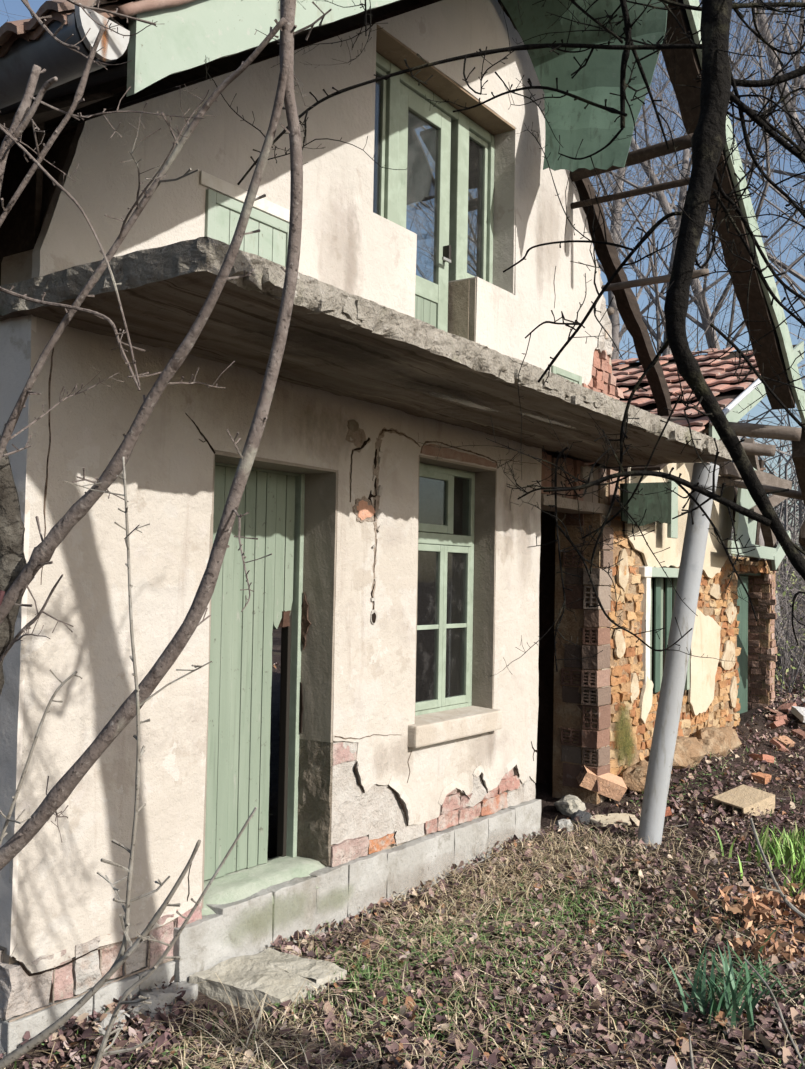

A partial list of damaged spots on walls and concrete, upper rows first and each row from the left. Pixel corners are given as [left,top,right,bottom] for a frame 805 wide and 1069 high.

flaking render [352,496,377,523]
crack [349,427,536,610]
flaking render [297,682,536,867]
flaking render [0,893,202,1022]